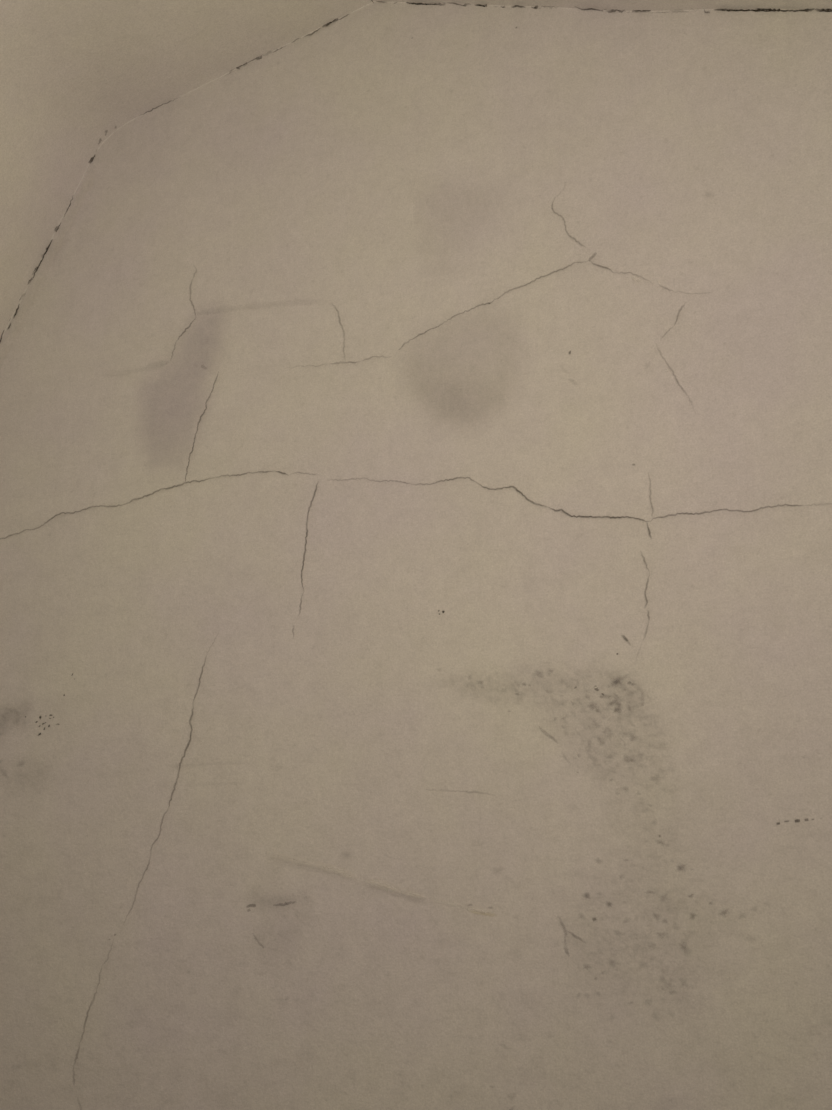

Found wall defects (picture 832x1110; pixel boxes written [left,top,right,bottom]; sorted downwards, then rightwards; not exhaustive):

crack [0,199,73,342]
crack [556,510,650,534]